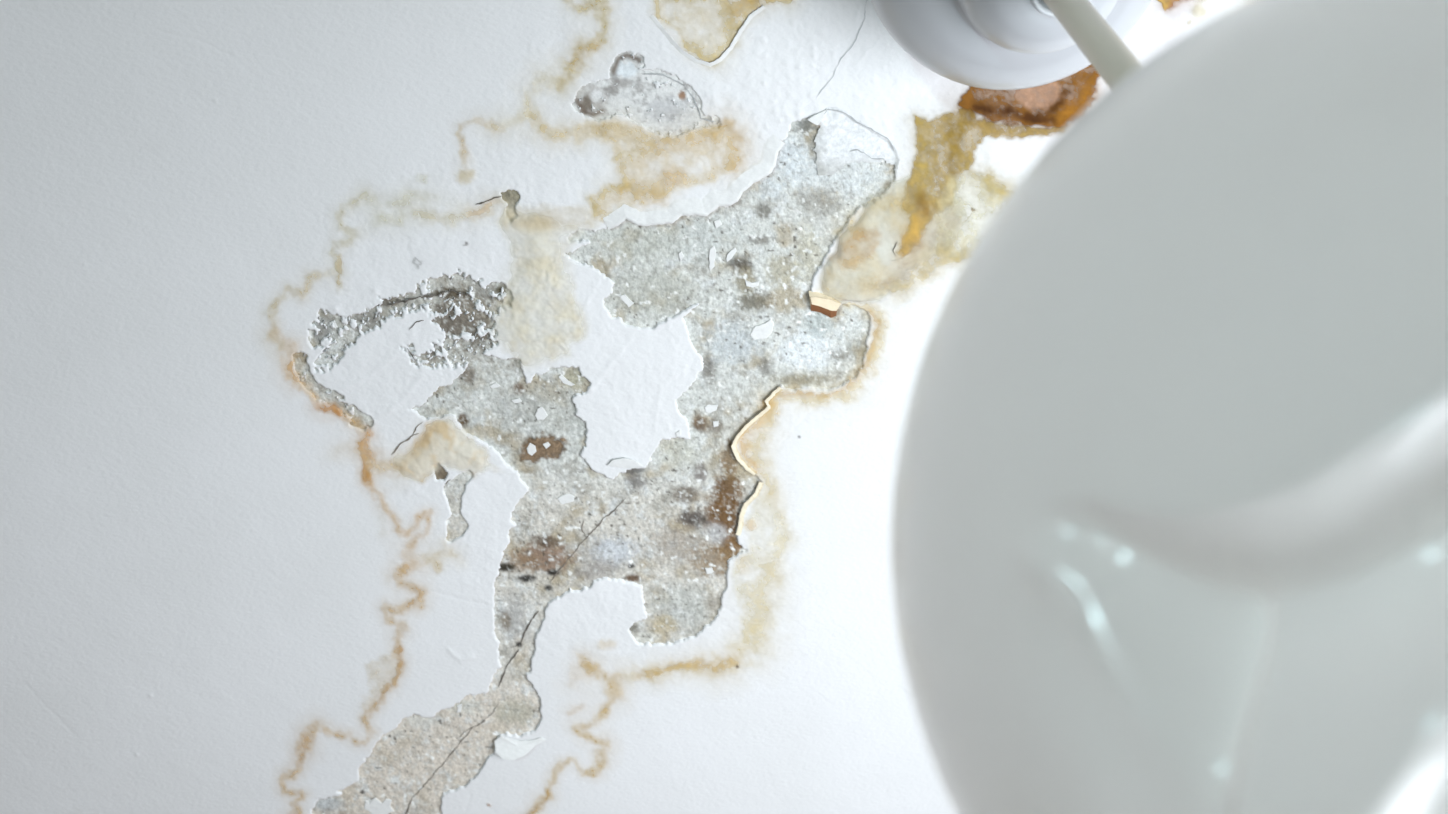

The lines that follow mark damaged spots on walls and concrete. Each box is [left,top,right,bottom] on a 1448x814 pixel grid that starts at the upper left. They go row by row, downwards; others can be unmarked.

peeling [649,5,766,67]
damp [684,0,791,62]
peeling [572,51,721,137]
damp [644,125,739,170]
damp [593,157,681,216]
damp [885,108,1069,292]
damp [742,306,883,467]
spalling [293,107,900,814]
damp [364,646,403,723]
damp [645,659,737,678]